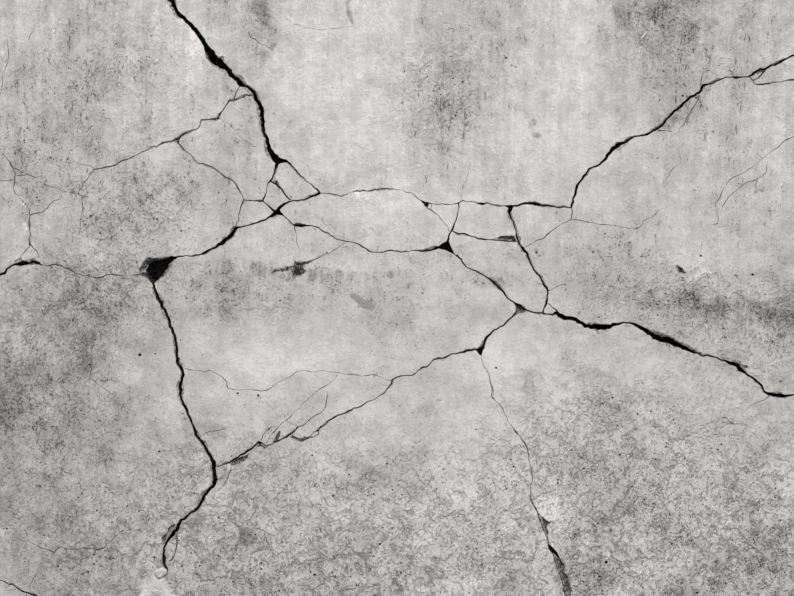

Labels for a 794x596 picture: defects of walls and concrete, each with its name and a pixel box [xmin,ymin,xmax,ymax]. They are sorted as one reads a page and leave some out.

crack [0,153,128,278]
crack [97,0,373,571]
crack [217,54,794,467]
crack [0,576,38,596]
crack [13,530,124,553]
crack [483,365,572,596]